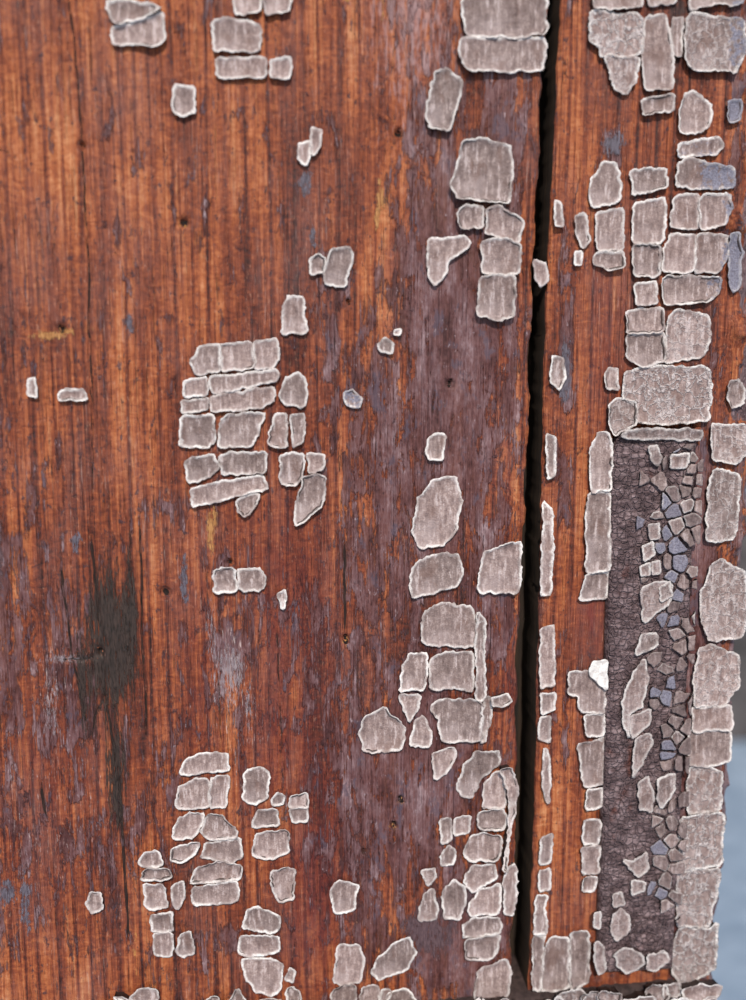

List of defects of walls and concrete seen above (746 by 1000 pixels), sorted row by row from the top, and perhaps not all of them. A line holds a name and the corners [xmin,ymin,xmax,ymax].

peeling [105,0,166,47]
peeling [210,0,293,80]
peeling [425,0,549,132]
peeling [426,137,550,322]
peeling [211,566,267,595]
peeling [178,295,327,526]
peeling [530,0,746,1000]
leakage [73,531,142,829]
peeling [358,476,523,1000]
peeling [138,751,310,1000]
peeling [329,880,360,915]
peeling [330,936,417,1000]